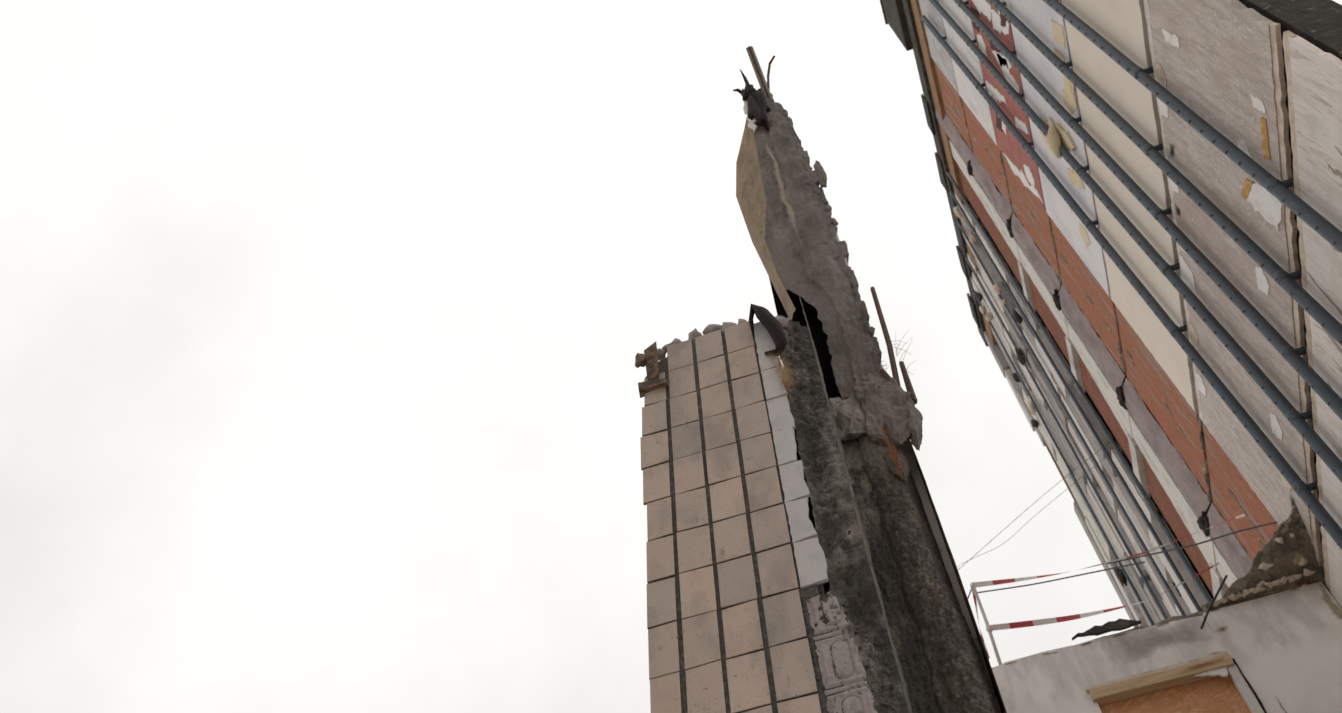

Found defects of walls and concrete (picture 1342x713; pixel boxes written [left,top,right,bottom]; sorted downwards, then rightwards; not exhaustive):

peeling [1003,153,1044,204]
peeling [970,0,1085,189]
spalling [657,315,909,713]